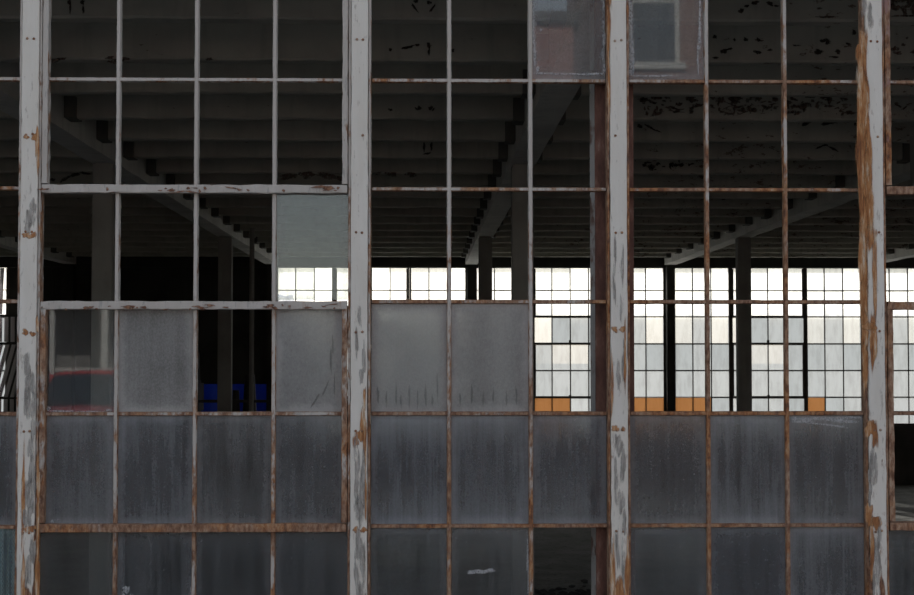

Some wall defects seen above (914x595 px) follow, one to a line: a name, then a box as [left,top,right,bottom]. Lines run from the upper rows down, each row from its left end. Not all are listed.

peeling [697,0,772,73]
peeling [637,97,857,132]
rust [856,32,877,393]
peeling [355,306,366,383]
peeling [22,353,37,526]
rust [865,420,878,448]
peeling [354,438,366,595]
peeling [614,434,626,584]
rust [865,504,885,595]